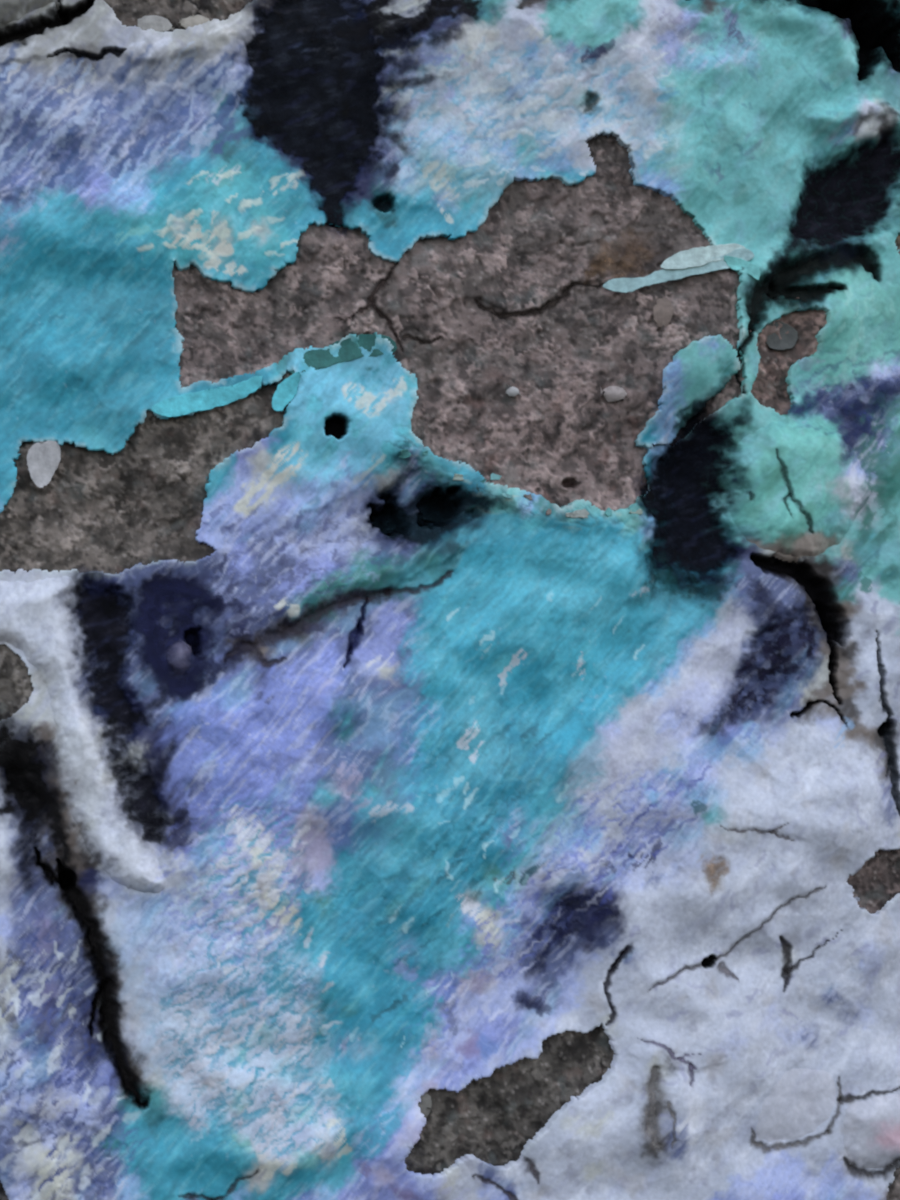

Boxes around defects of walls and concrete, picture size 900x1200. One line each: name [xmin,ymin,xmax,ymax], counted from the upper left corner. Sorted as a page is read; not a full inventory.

spalling [104,0,253,32]
damp [239,0,482,227]
damp [767,139,900,279]
peeling [0,133,827,574]
damp [639,387,751,600]
crack [224,571,453,667]
crack [750,551,847,720]
crack [876,631,900,816]
crack [34,847,149,1109]
crack [649,887,842,992]
peeling [847,849,900,914]
peeling [404,1025,615,1175]